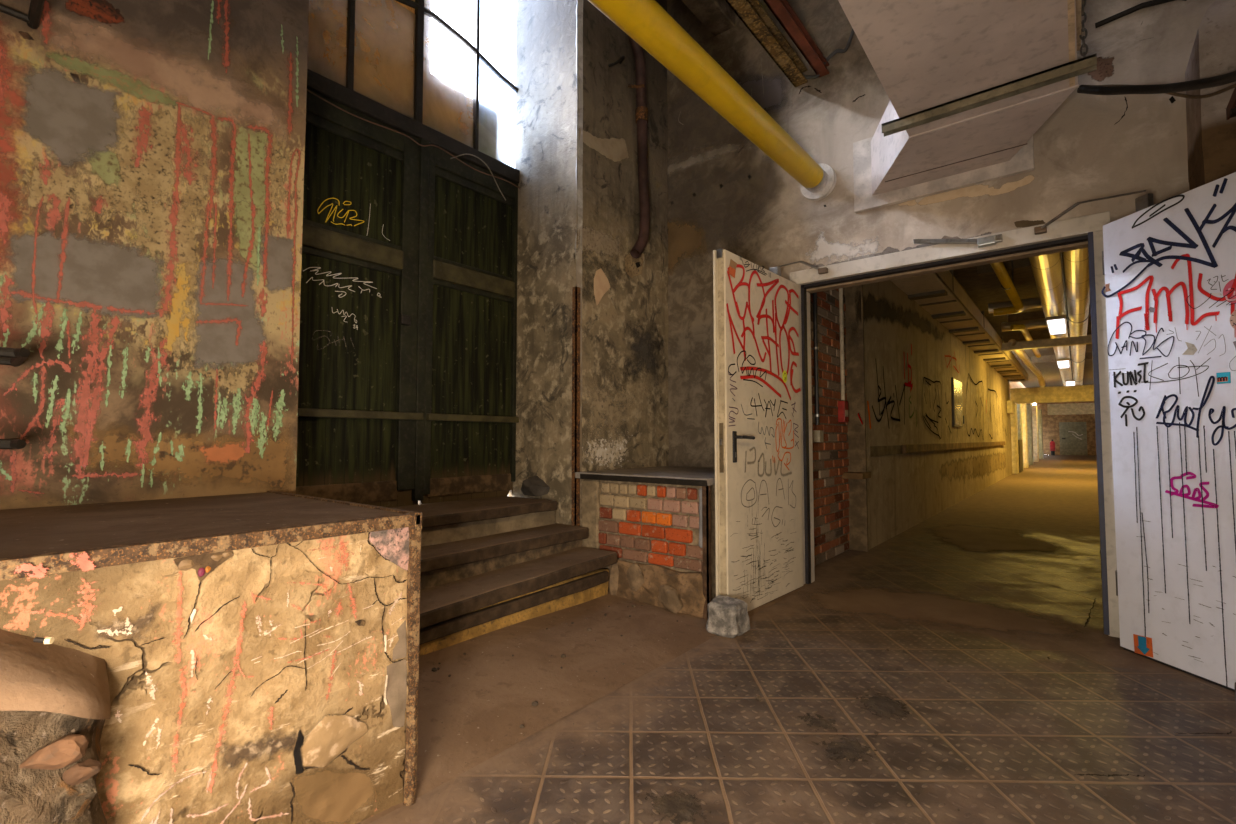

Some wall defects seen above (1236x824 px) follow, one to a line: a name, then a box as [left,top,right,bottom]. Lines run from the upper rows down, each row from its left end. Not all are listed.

flaking render [65,0,125,24]
flaking render [810,232,991,269]
crack [64,639,109,650]
crack [140,532,407,689]
crack [250,619,307,704]
crack [290,748,370,824]